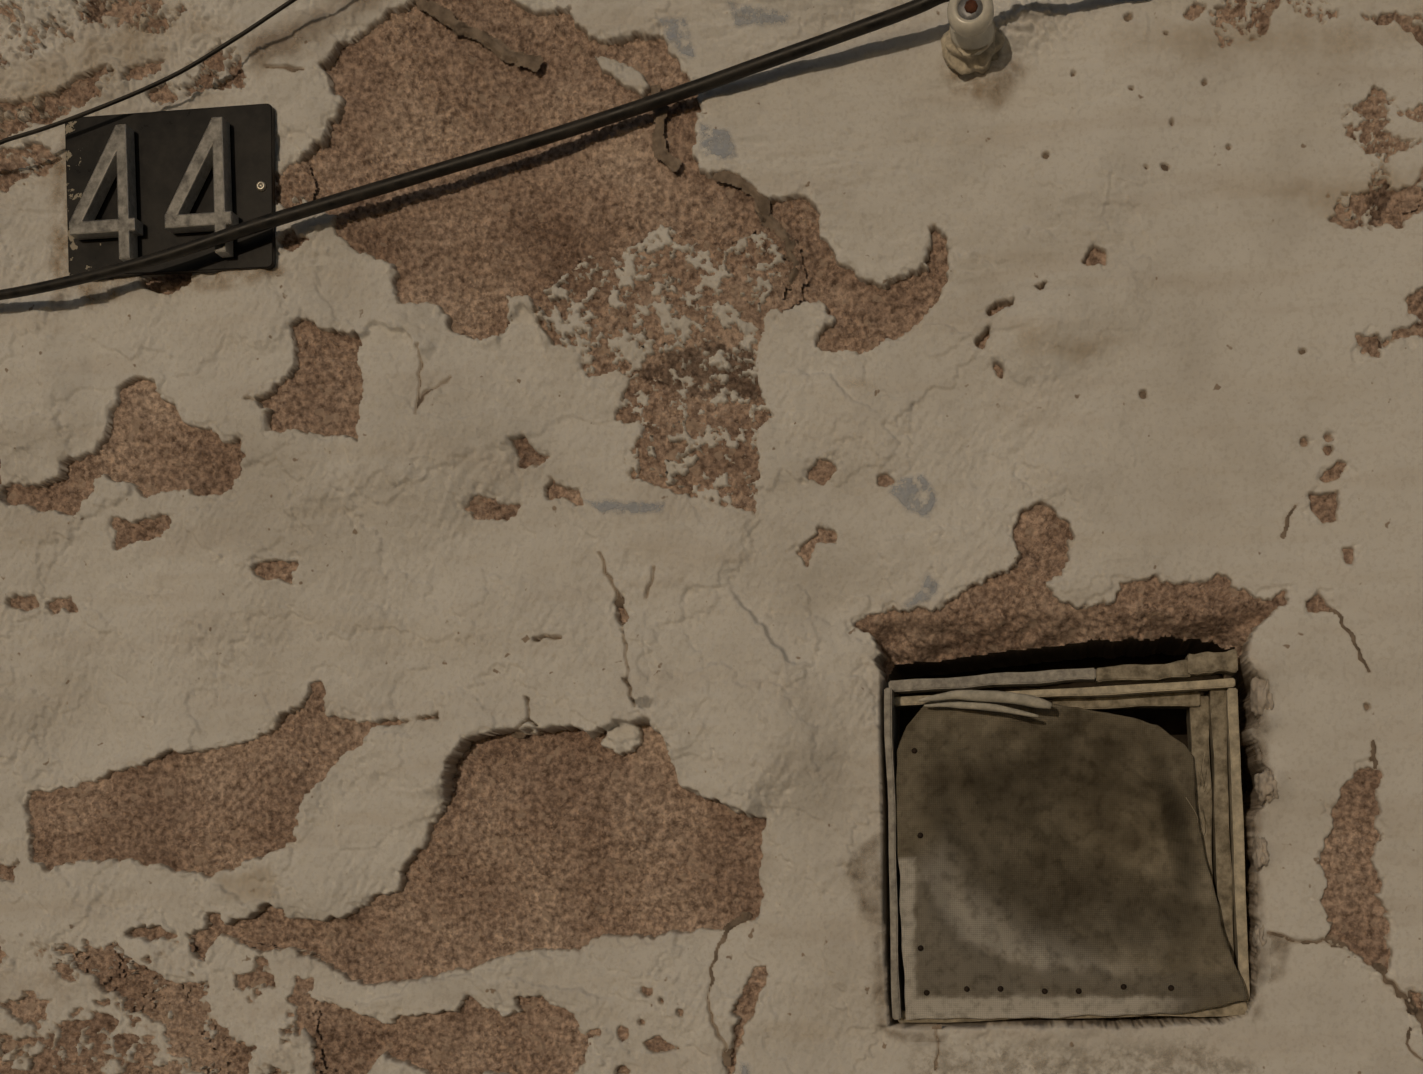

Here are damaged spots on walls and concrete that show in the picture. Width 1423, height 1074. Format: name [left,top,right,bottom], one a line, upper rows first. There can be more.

flaking render [1183,0,1337,48]
flaking render [0,50,246,193]
flaking render [1330,88,1423,231]
flaking render [260,0,949,514]
flaking render [1355,289,1423,358]
flaking render [0,380,246,516]
flaking render [465,495,521,521]
crack [602,556,626,625]
flaking render [856,505,1287,682]
flaking render [0,586,768,1074]
flaking render [1320,760,1391,969]
crack [707,912,752,1066]